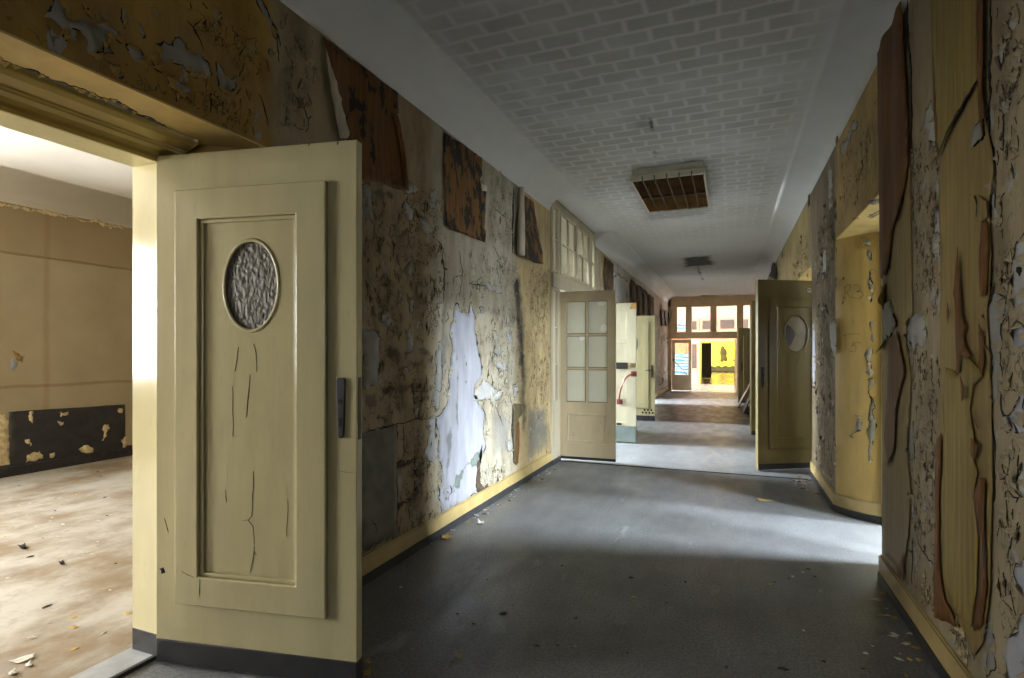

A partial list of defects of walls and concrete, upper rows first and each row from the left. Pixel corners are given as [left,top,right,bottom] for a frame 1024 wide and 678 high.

peeling [0,56,166,128]
peeling [44,0,237,97]
peeling [984,3,1024,238]
peeling [862,236,874,303]
flaking render [0,414,10,466]
spalling [3,439,67,482]
spalling [79,424,110,453]
flaking render [362,181,550,555]
peeling [849,321,888,463]
peeling [904,100,940,557]
peeling [949,233,1024,678]